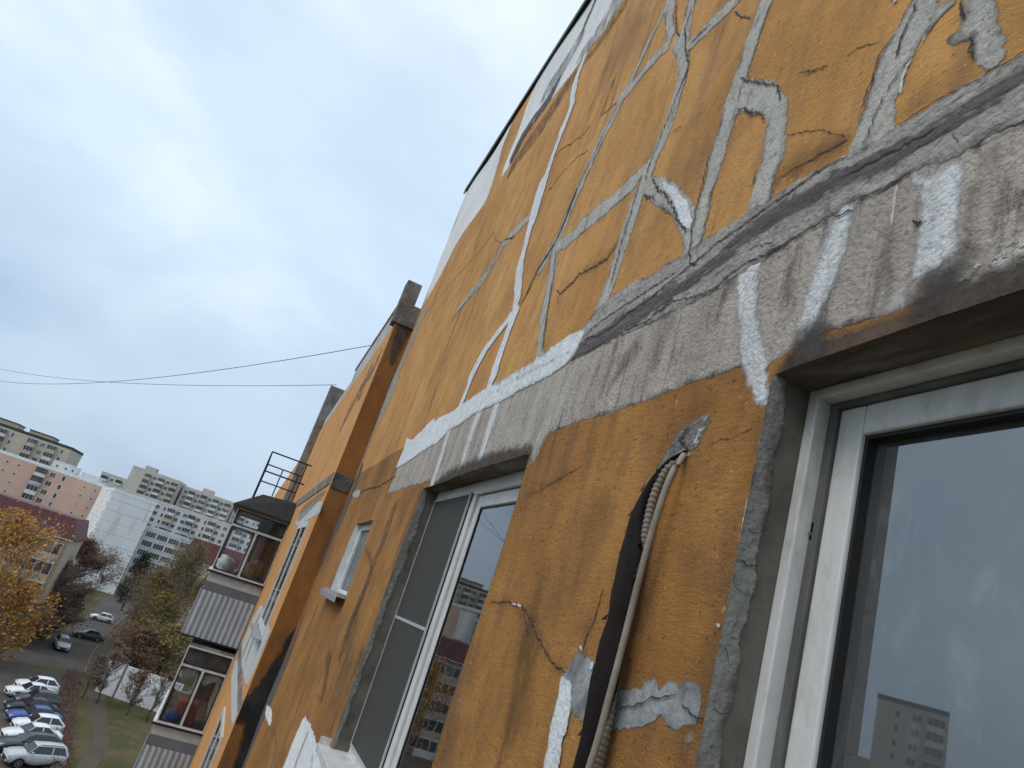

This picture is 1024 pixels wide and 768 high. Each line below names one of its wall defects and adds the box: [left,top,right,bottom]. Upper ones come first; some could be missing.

crack [430,0,1024,407]
peeling [959,234,1024,282]
flaking render [658,415,710,468]
crack [491,601,565,673]